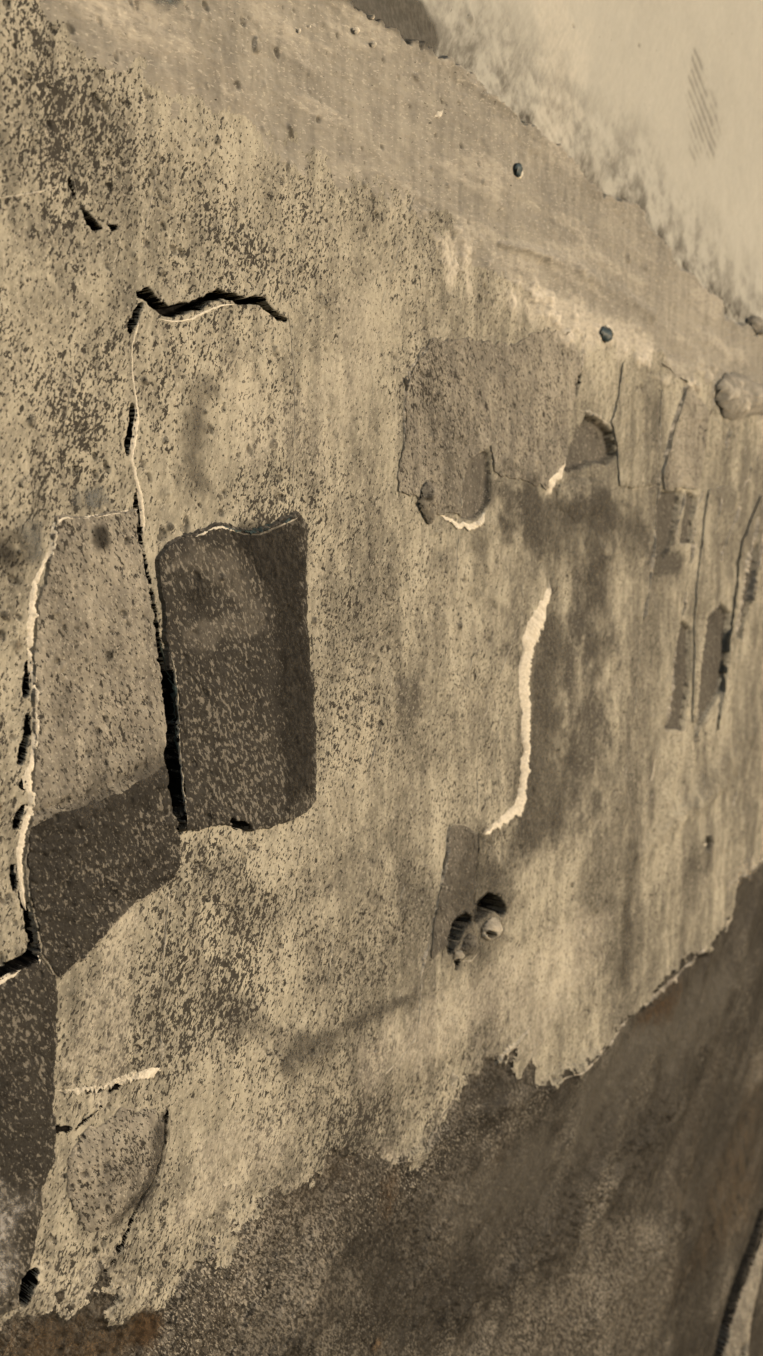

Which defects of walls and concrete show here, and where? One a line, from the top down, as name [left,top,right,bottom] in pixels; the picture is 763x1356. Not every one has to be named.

crack [0,119,314,985]
peeling [0,508,317,1318]
peeling [396,325,763,734]